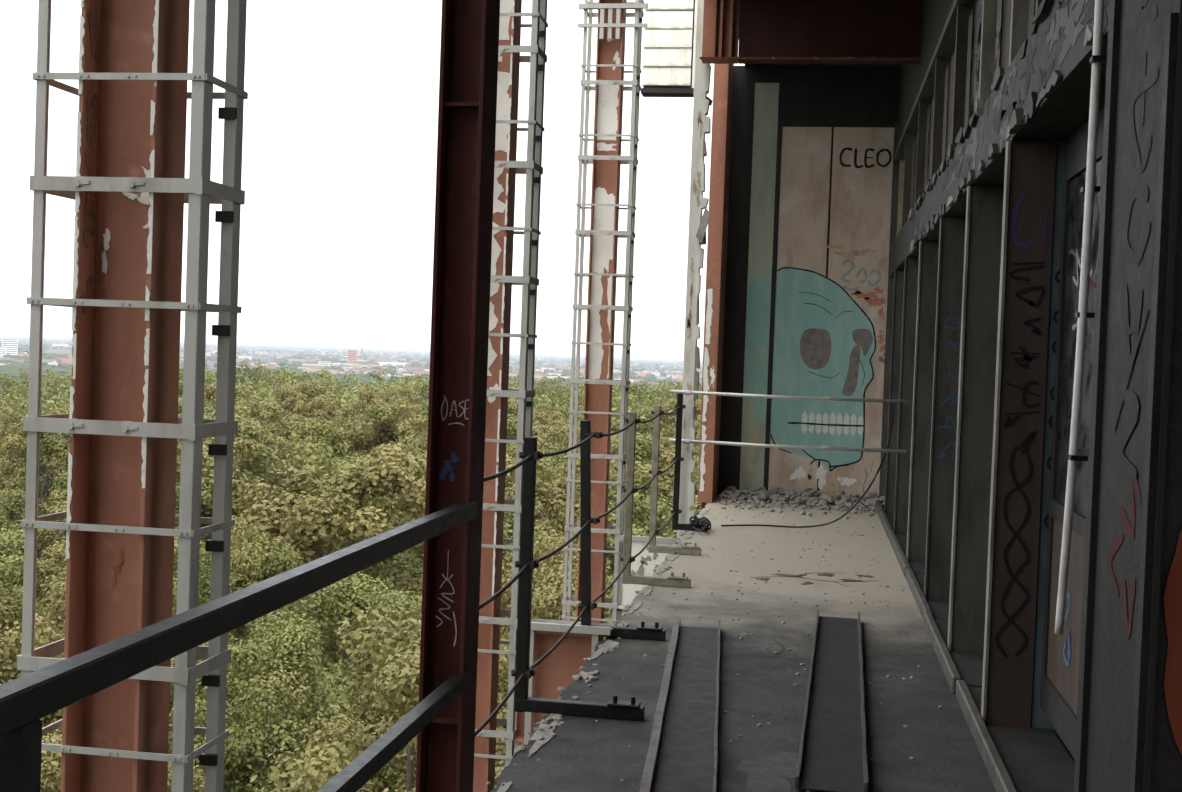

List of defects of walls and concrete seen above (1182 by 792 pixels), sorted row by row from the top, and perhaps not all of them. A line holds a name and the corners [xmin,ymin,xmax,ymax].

peeling [76,0,100,177]
peeling [142,149,155,178]
peeling [150,0,159,135]
peeling [596,79,619,151]
peeling [69,191,111,418]
peeling [123,192,154,422]
peeling [588,187,615,380]
spalling [618,64,715,626]
spalling [529,713,562,756]
spalling [591,638,617,659]